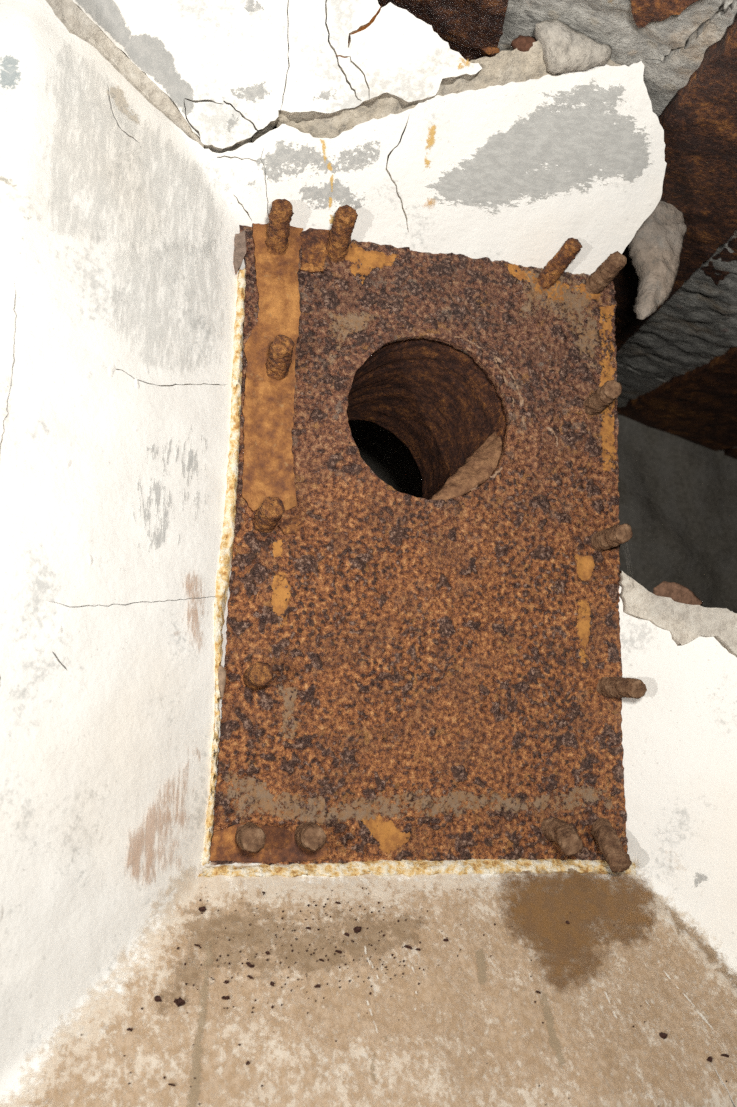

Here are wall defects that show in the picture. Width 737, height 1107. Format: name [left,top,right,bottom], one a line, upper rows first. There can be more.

crack [46,0,268,221]
peeling [248,97,416,210]
crack [325,4,382,100]
spalling [436,40,563,96]
peeling [425,80,652,216]
rust [506,264,616,387]
rust [430,431,514,500]
spalling [619,570,737,657]
rust [0,771,737,1107]
water stain [475,949,487,983]
water stain [186,944,213,1107]
water stain [540,991,566,1066]